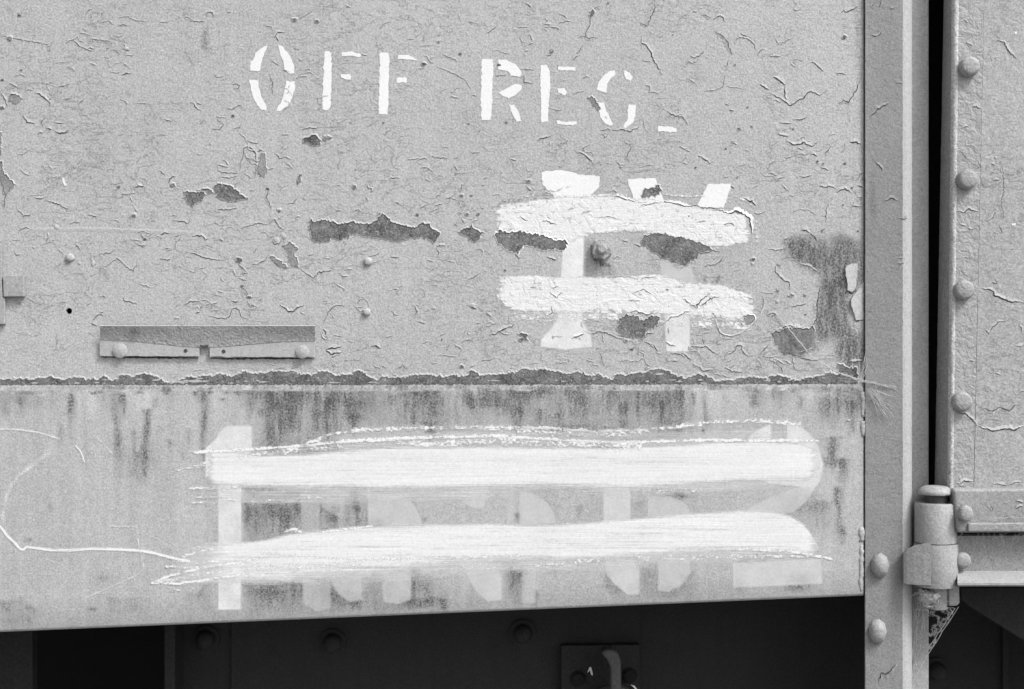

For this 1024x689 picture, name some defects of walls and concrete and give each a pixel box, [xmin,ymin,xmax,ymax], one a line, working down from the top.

peeling [0,131,16,195]
peeling [169,182,249,208]
crack [0,0,907,385]
peeling [308,212,441,244]
peeling [458,212,569,254]
peeling [640,231,713,266]
peeling [616,313,661,350]
peeling [772,314,816,356]
peeling [836,362,860,379]